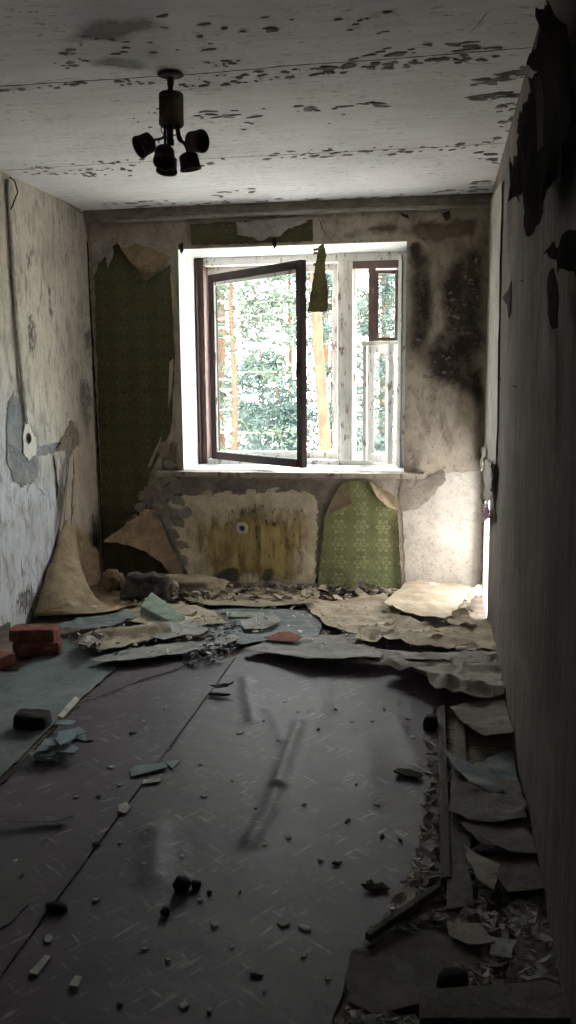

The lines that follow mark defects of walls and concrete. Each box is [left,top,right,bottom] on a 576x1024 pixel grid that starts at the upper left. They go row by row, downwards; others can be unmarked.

peeling [0,81,87,92]
peeling [54,44,89,69]
peeling [193,108,265,130]
peeling [179,23,503,88]
peeling [262,70,525,165]
peeling [23,159,150,177]
peeling [164,188,292,206]
peeling [433,180,491,195]
leakage [408,219,485,431]
spalling [6,391,80,488]
peeling [125,441,345,584]
peeling [399,445,493,589]